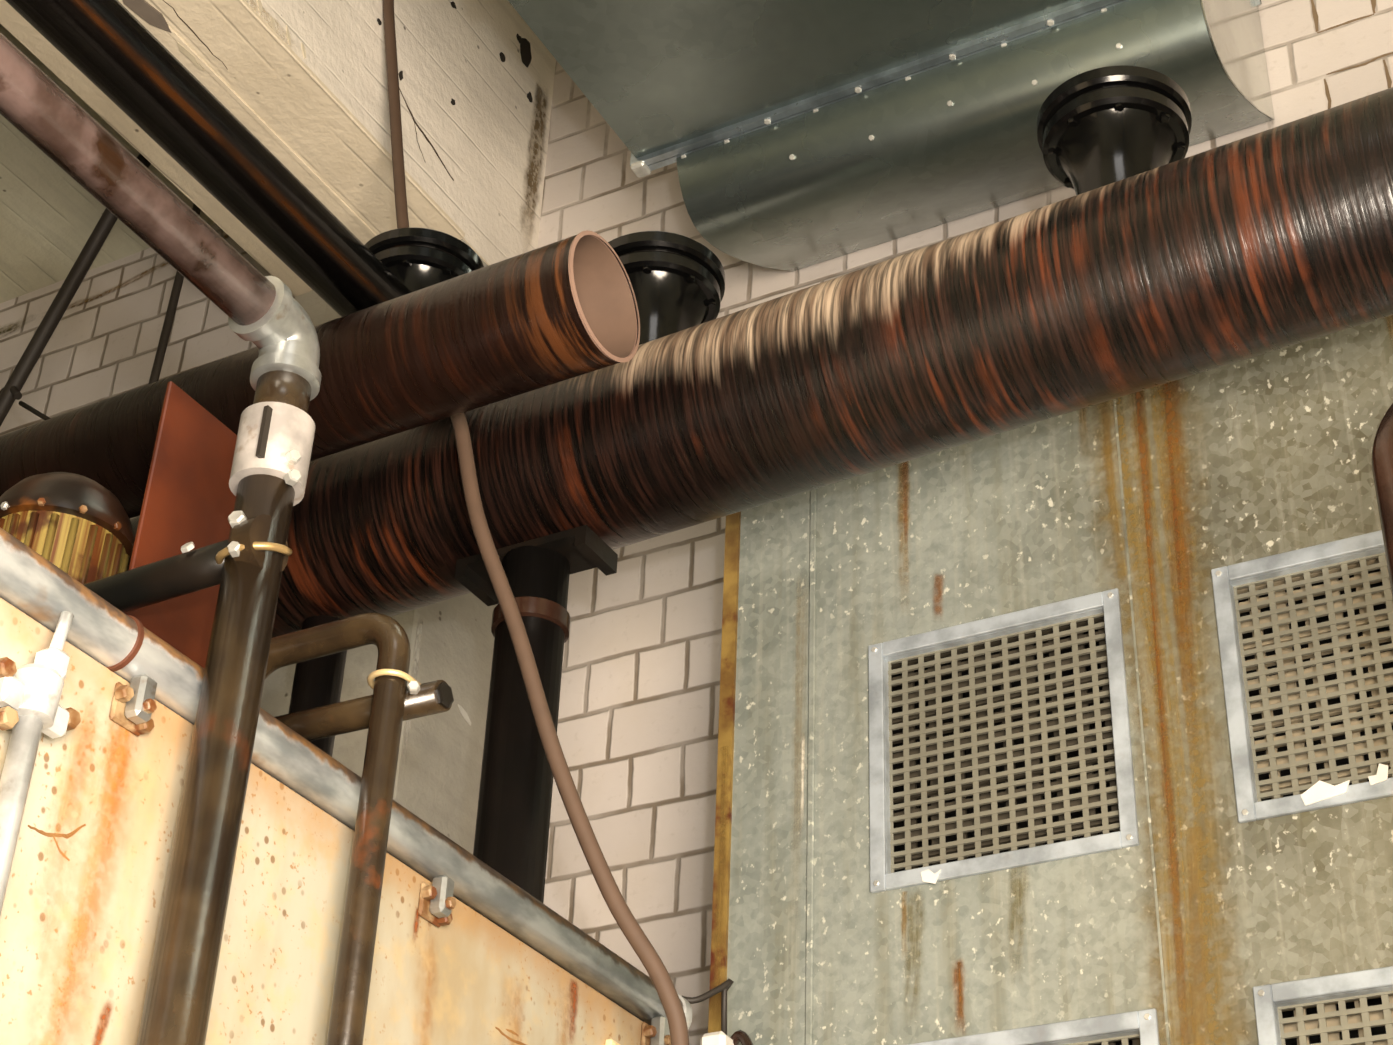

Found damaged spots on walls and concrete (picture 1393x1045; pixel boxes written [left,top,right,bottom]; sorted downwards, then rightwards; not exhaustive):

leakage [526,86,547,218]
corrosion [899,461,909,539]
corrosion [934,576,942,613]
corrosion [1080,380,1232,1045]